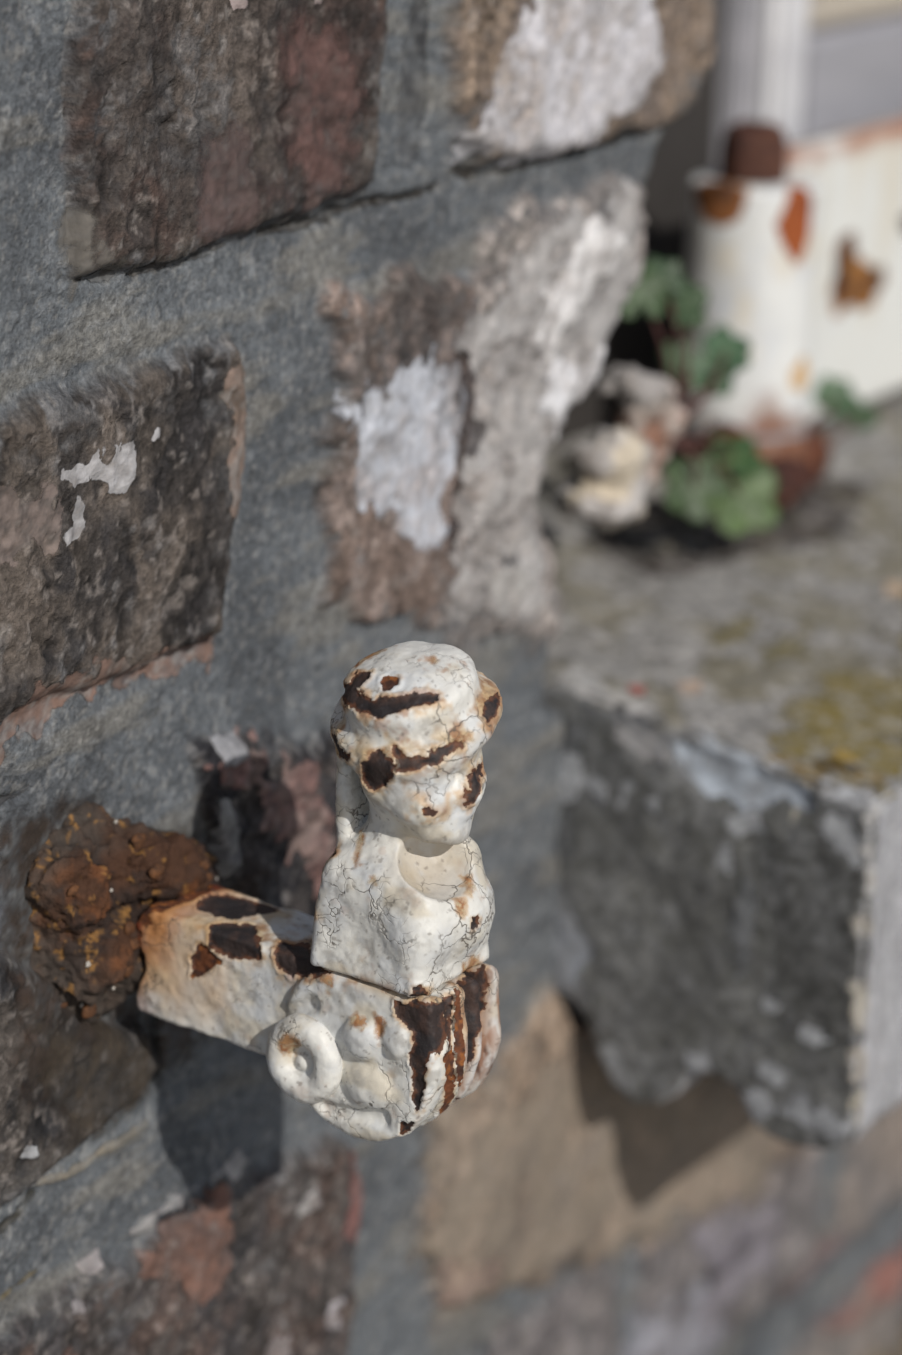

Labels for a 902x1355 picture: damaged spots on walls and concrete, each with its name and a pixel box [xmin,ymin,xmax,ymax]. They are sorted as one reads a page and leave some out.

peeling [342,672,439,719]
peeling [463,762,483,808]
rust [136,830,262,937]
spalling [190,724,464,979]
rust [0,798,207,1148]
spalling [552,910,592,993]
peeling [394,964,490,1135]